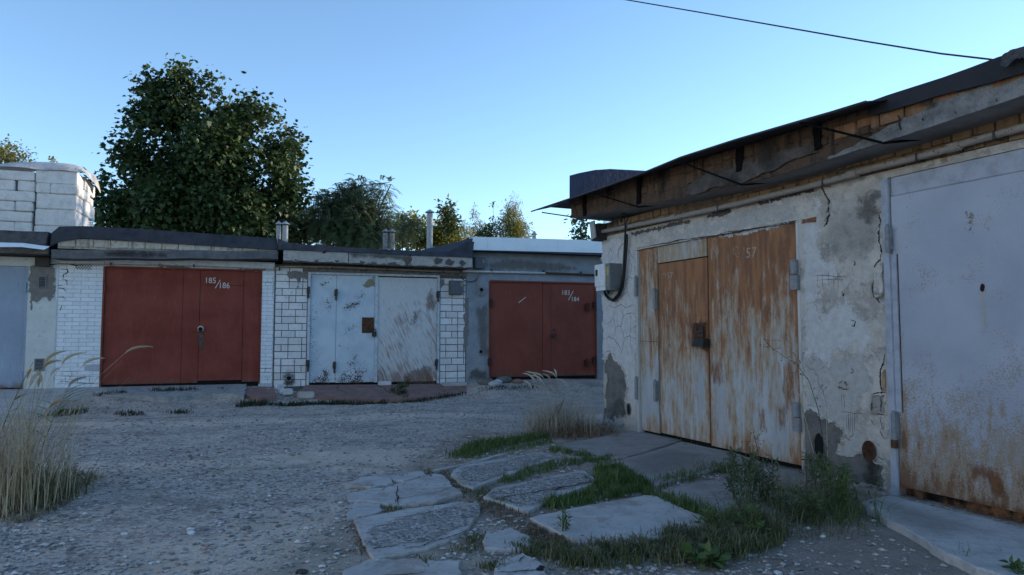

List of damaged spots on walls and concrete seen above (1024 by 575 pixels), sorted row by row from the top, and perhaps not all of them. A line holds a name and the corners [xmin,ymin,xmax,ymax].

peeling [601,237,637,428]
crack [604,186,830,354]
peeling [674,195,888,493]
crack [817,212,884,303]
rust [944,466,1024,523]